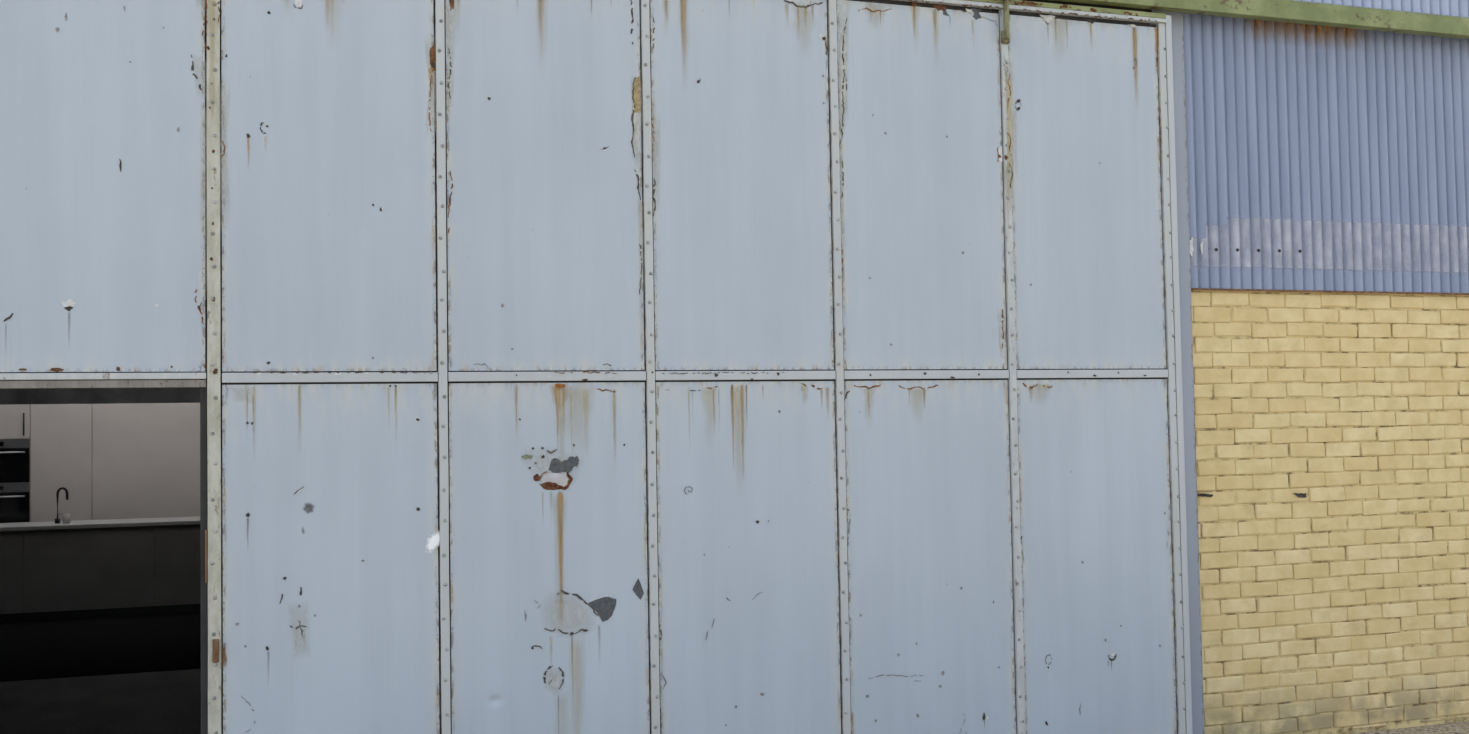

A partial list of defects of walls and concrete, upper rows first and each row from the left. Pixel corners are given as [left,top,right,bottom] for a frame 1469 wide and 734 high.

rust [555,371,573,419]
rust [690,385,747,436]
peeling [521,444,580,490]
rust [542,494,563,578]
peeling [633,578,644,600]
peeling [531,590,616,650]
peeling [543,665,565,689]